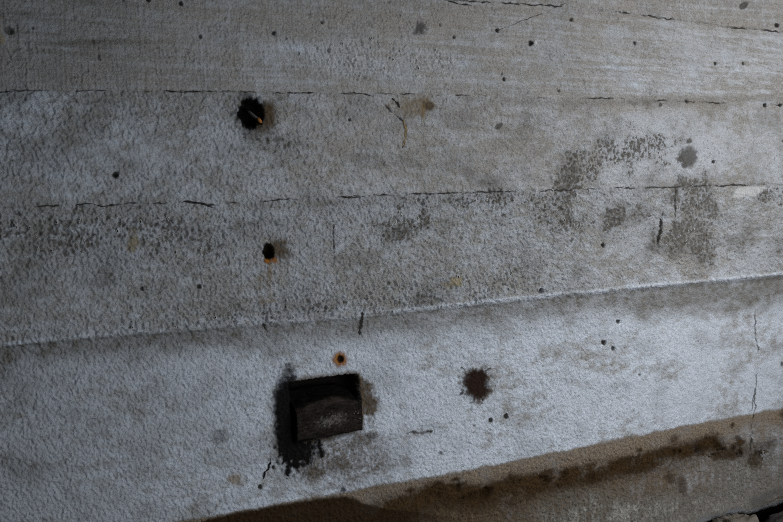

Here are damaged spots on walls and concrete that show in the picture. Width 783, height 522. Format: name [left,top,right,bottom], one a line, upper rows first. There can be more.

damp [677,139,697,168]
rust [333,352,347,366]
damp [296,373,377,421]
damp [180,409,783,522]